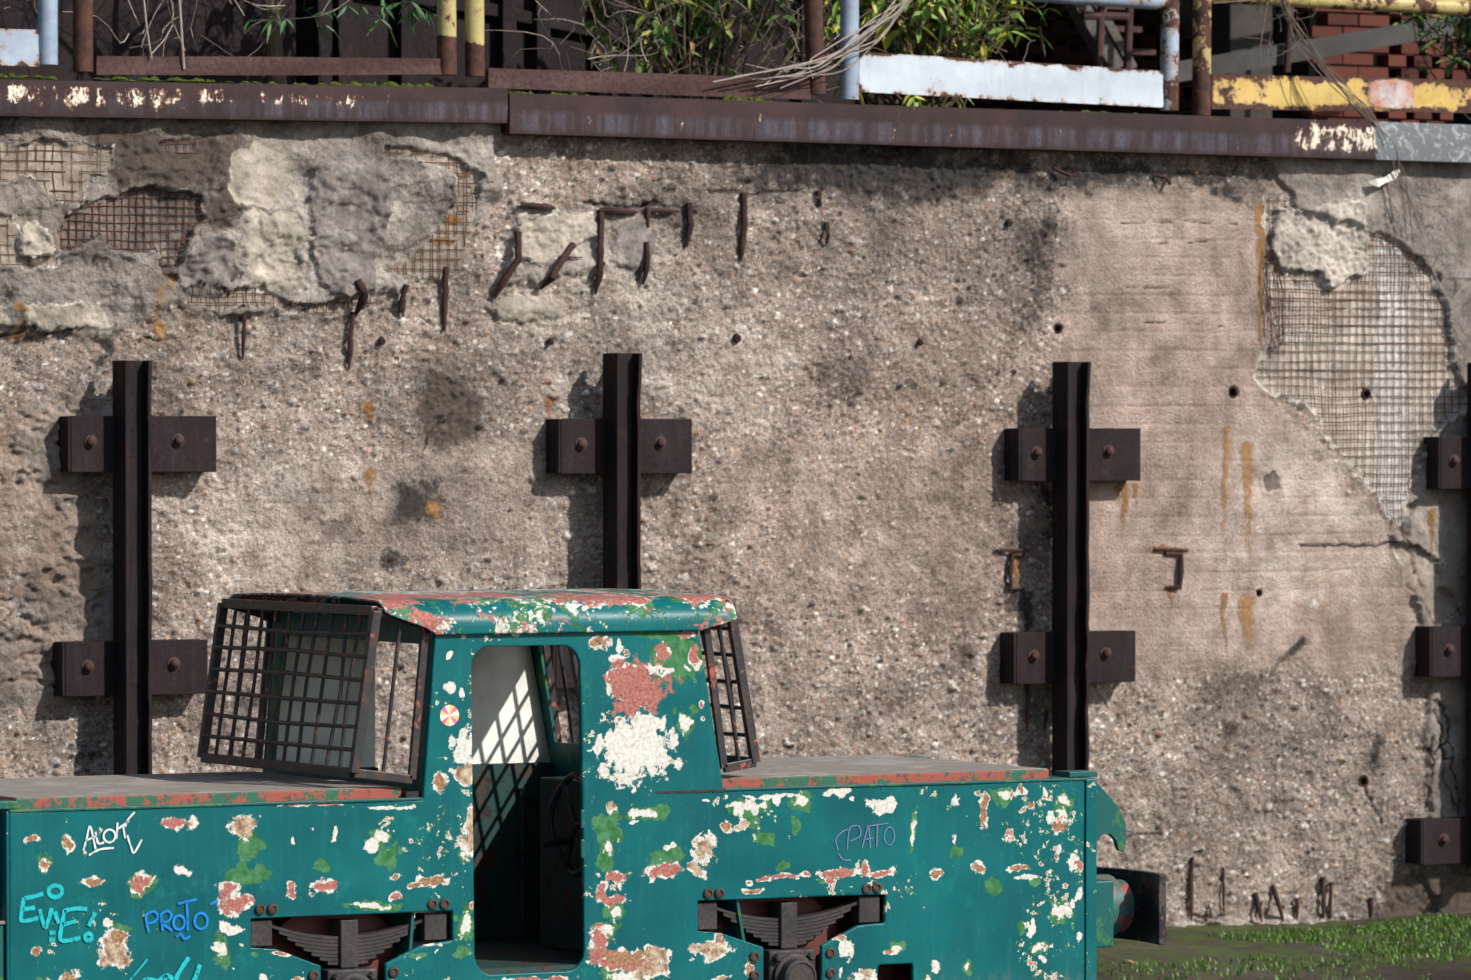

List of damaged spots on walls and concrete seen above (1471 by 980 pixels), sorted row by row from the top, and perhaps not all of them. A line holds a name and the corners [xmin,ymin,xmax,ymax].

peeling [1369,169,1400,187]
peeling [0,139,486,369]
rust [1254,204,1265,342]
spalling [1253,192,1467,626]
rust [1222,426,1253,561]
rust [1220,592,1255,645]
crack [1425,700,1460,814]